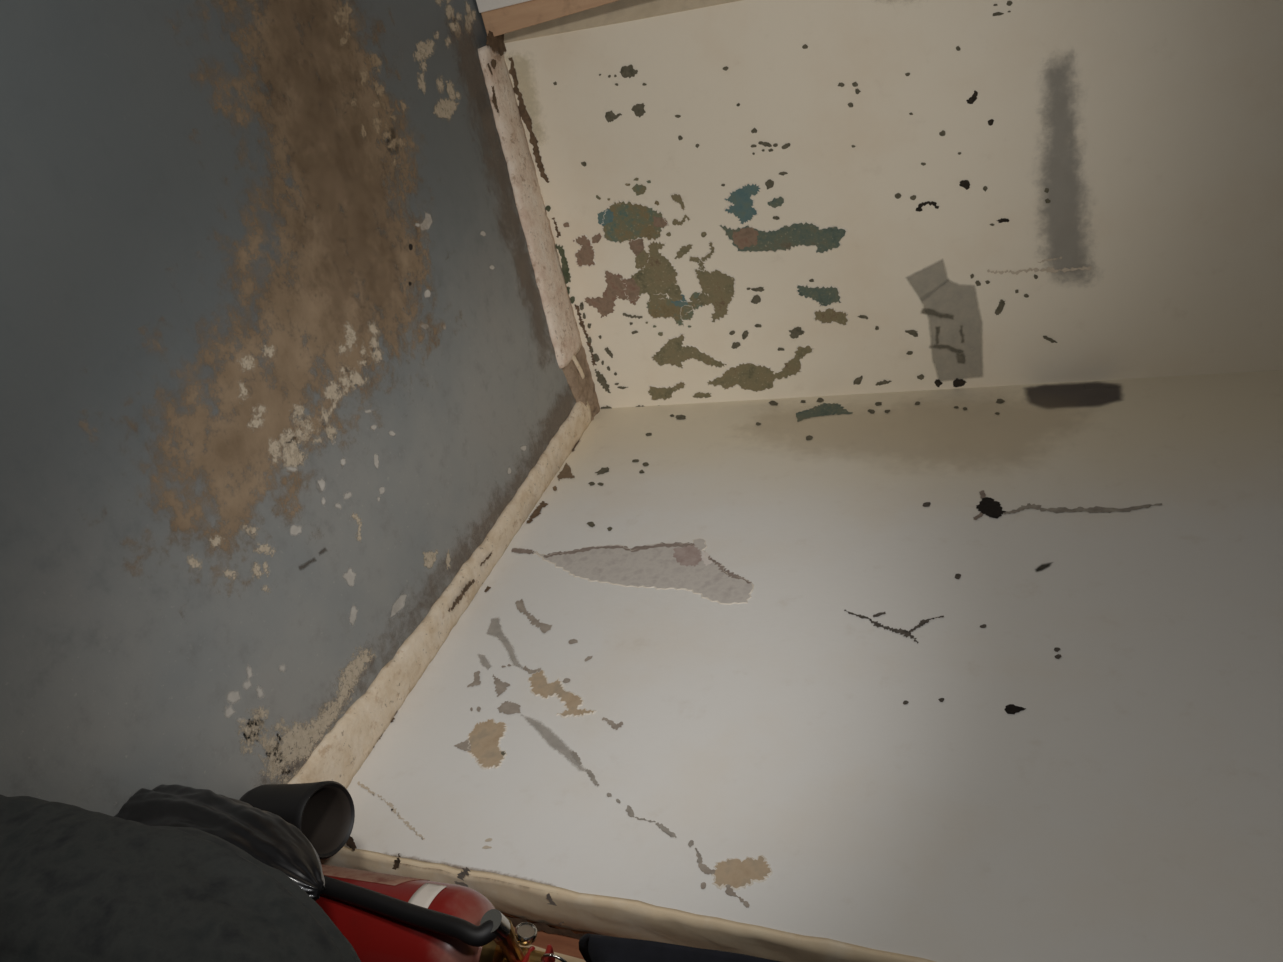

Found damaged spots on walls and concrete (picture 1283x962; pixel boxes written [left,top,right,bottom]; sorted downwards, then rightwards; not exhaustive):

water stain [142,0,445,553]
peeling [556,172,879,421]
peeling [237,322,382,472]
peeling [917,374,966,387]
crack [1004,503,1162,514]
flaking render [511,522,754,605]
flaking render [515,599,552,633]
crack [844,610,944,643]
flaking render [454,664,623,770]
crack [346,836,357,851]
crack [357,781,425,870]
crack [571,751,701,863]